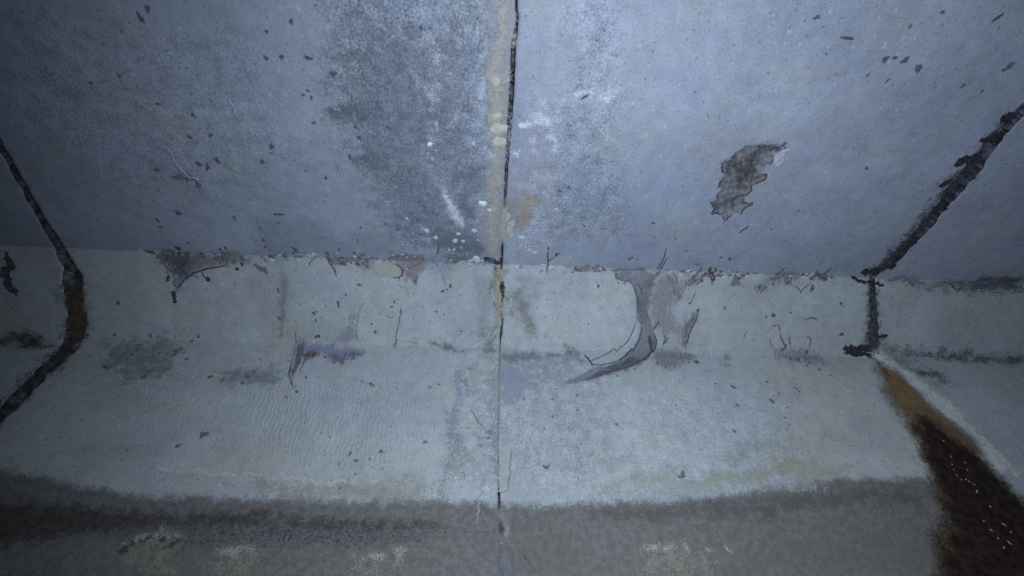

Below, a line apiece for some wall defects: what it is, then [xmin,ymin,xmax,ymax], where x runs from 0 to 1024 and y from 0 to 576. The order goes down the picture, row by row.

spalling [710,142,790,221]
crack [934,111,1016,213]
crack [851,239,919,287]
crack [842,334,888,359]
crack [500,451,512,493]
corrosion [875,363,1024,576]